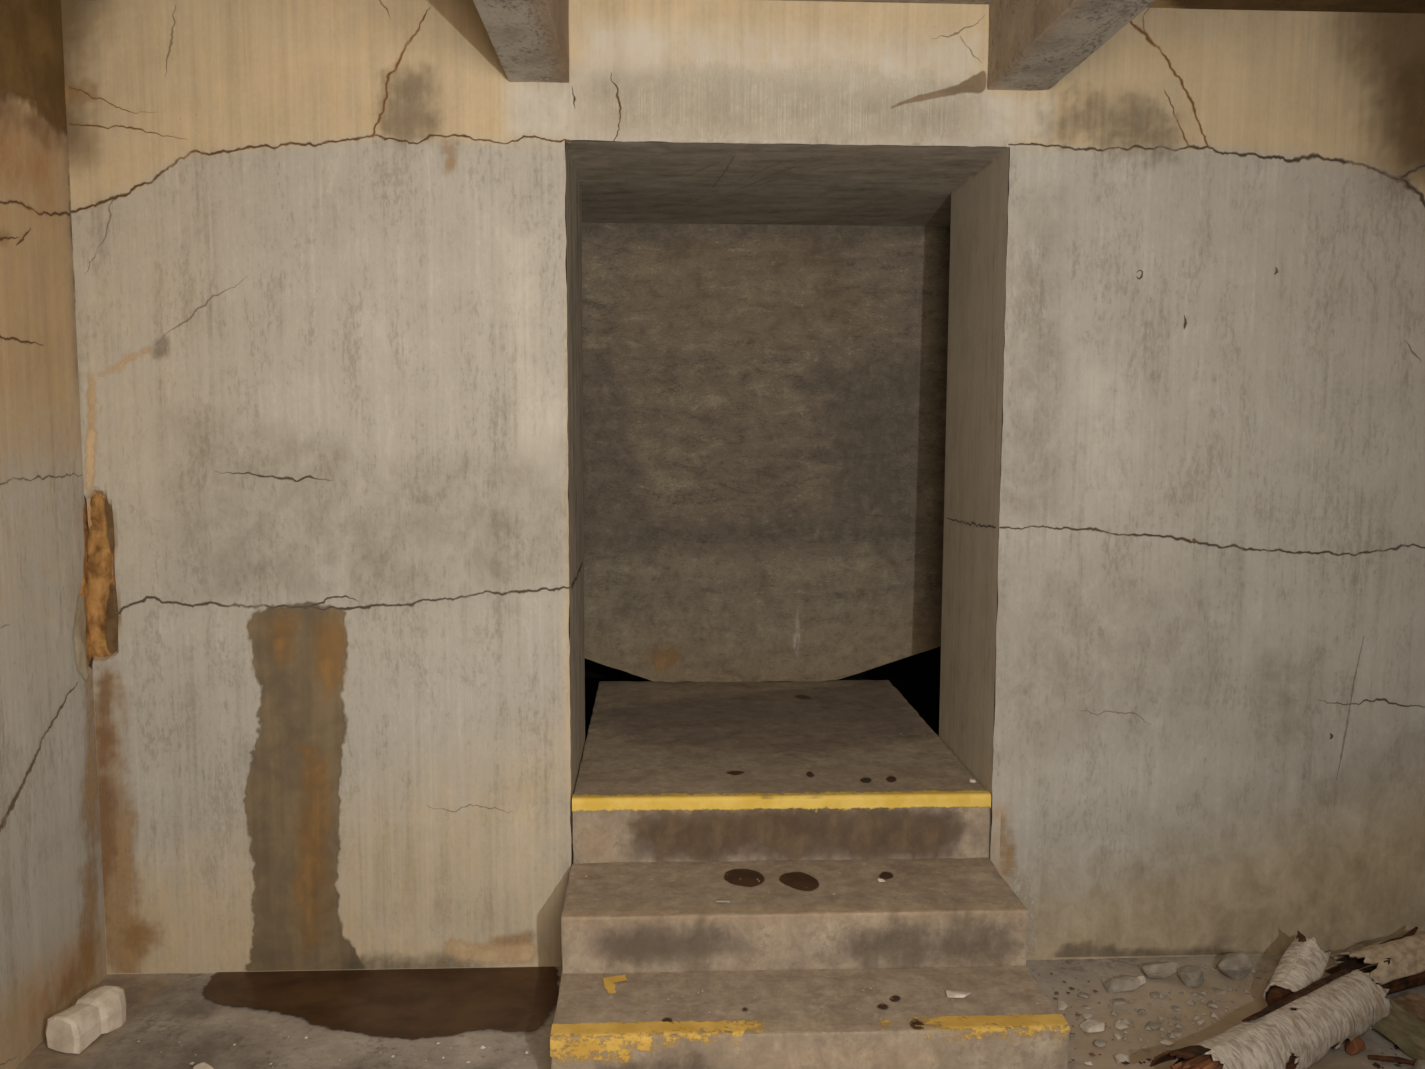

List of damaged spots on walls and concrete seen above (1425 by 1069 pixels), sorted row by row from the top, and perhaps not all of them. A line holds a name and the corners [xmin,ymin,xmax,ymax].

crack [611,73,622,141]
crack [1008,21,1425,207]
crack [0,8,576,303]
crack [0,335,44,346]
crack [0,473,81,485]
crack [948,518,1425,556]
crack [114,563,583,616]
crack [0,682,78,832]